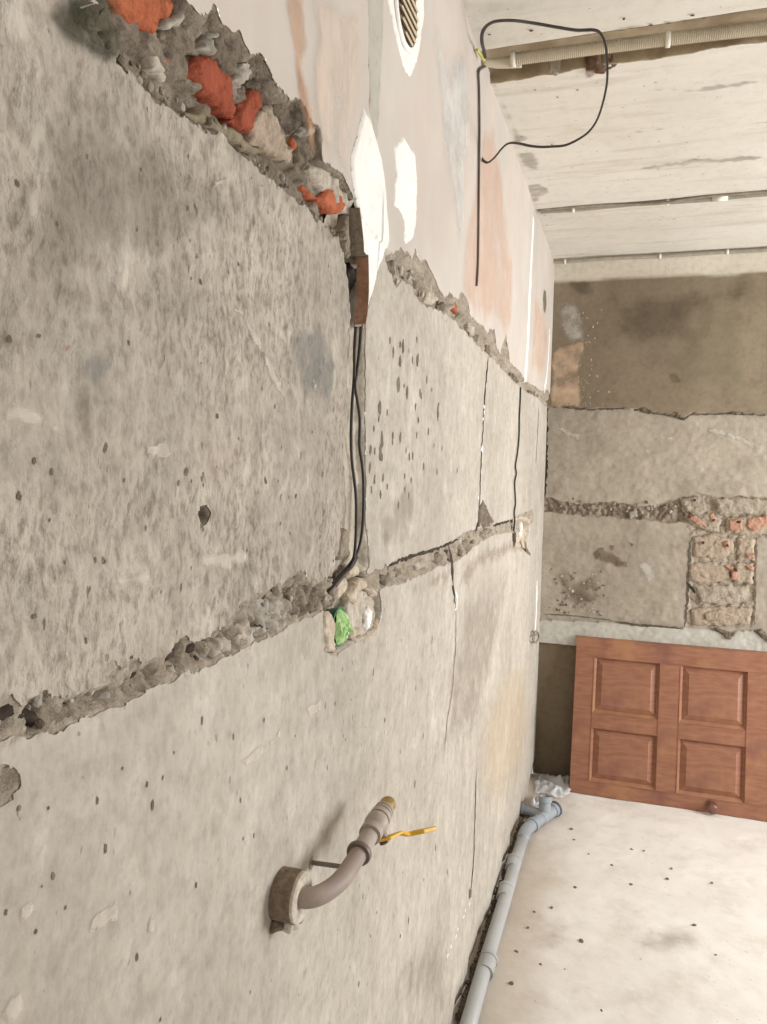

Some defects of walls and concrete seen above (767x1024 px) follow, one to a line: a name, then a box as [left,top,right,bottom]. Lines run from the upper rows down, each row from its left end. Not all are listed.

flaking render [79,0,354,237]
flaking render [385,247,766,420]
spalling [369,337,429,498]
crack [475,363,494,534]
spalling [0,704,38,727]
spalling [164,643,195,662]
spalling [319,528,382,656]
crack [448,545,458,611]
spalling [511,516,531,555]
flaking render [680,493,767,628]